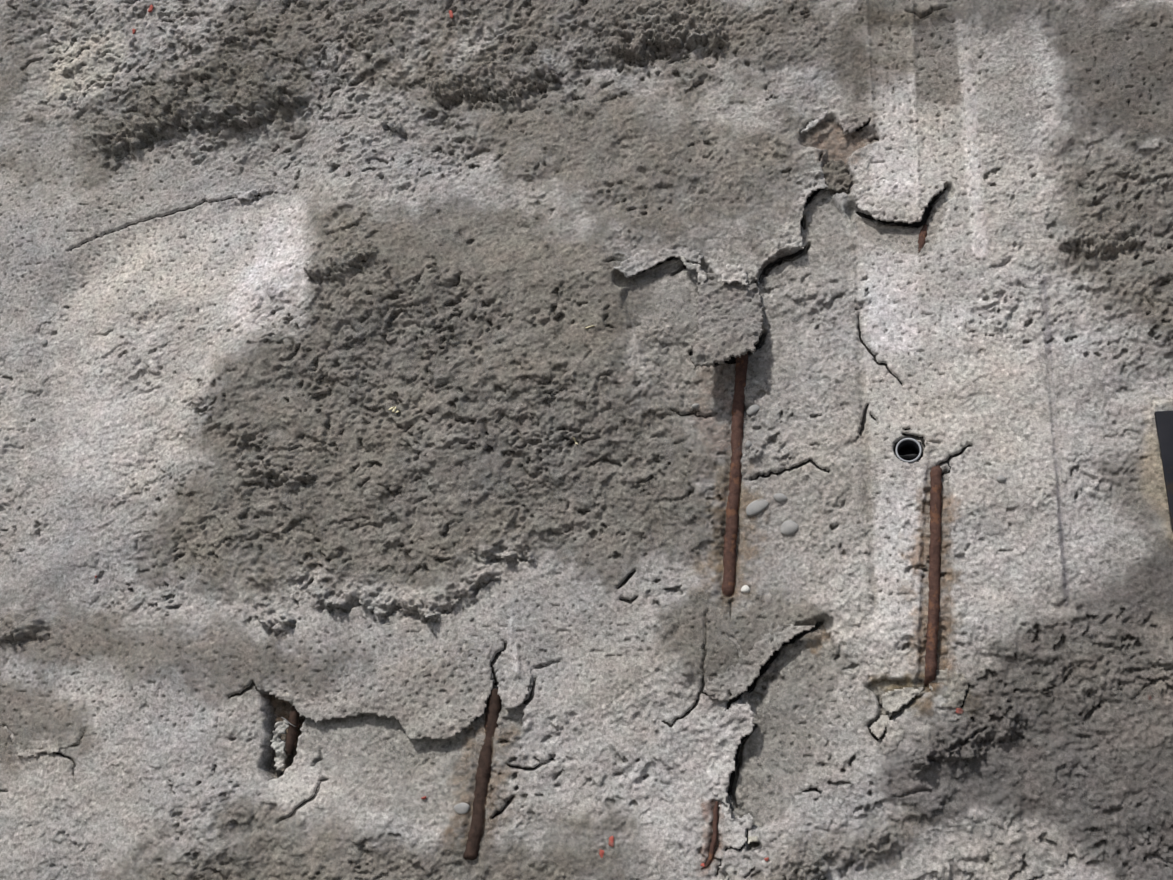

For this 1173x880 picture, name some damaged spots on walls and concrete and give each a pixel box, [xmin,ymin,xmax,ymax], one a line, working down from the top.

spalling [614,111,946,402]
spalling [256,623,532,778]
crack [727,735,747,805]
crack [662,622,820,727]
spalling [693,623,836,880]
spalling [868,469,968,755]
crack [716,829,755,877]